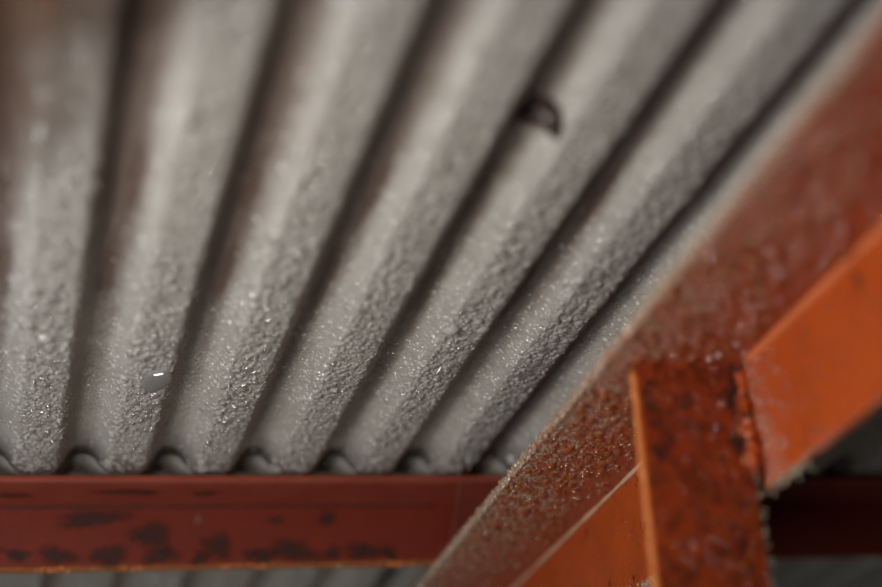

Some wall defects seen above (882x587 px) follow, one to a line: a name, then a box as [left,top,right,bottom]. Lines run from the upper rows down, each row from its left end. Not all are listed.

corrosion [0,522,437,574]